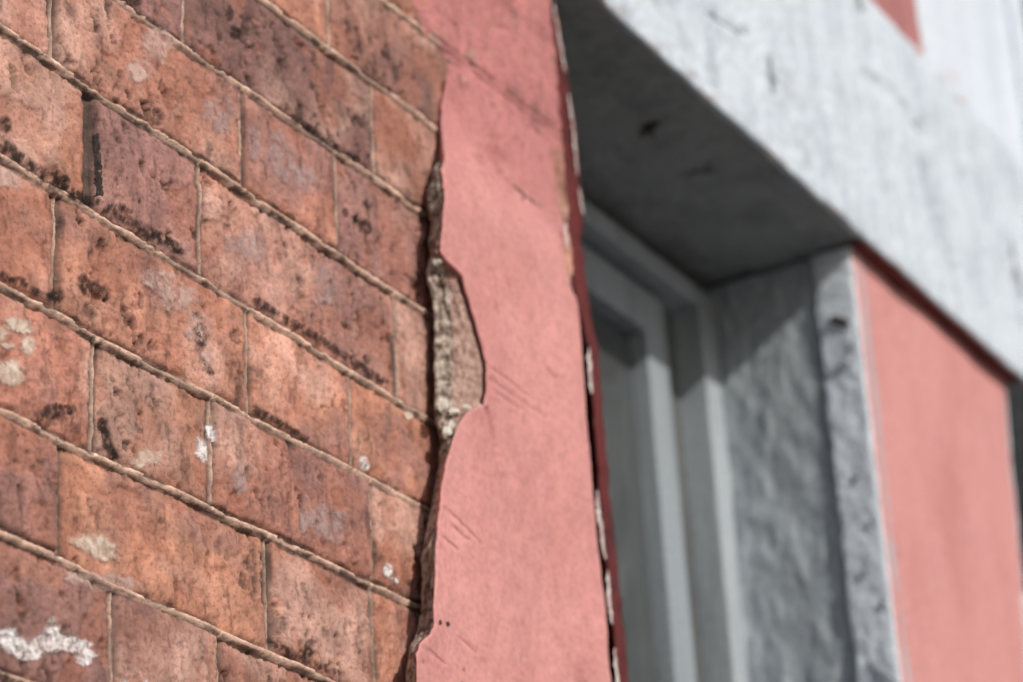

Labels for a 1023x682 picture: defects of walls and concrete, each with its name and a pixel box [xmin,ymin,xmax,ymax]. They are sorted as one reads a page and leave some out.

spalling [226,6,241,38]
spalling [343,200,372,233]
peeling [2,337,35,354]
spalling [197,325,214,374]
spalling [405,132,482,682]
leakage [195,426,215,462]
leakage [0,619,94,665]